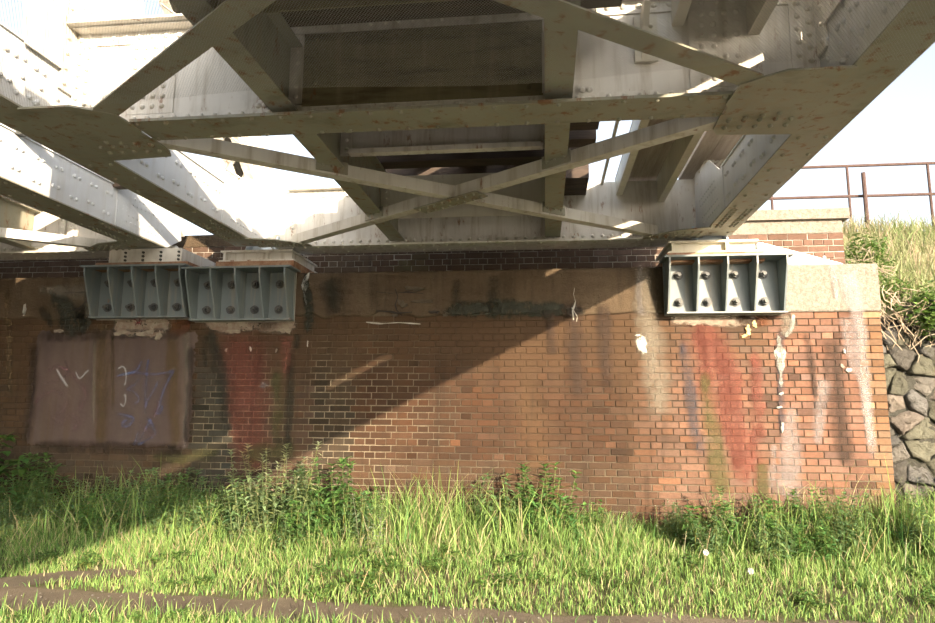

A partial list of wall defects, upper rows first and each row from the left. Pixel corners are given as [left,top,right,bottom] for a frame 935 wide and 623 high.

leakage [39,287,228,454]
flaking render [114,319,190,340]
flaking render [205,322,296,334]
leakage [444,279,584,393]
peeling [671,314,768,338]
efflorescence [774,314,795,433]
leakage [808,340,817,396]
leakage [827,346,853,462]